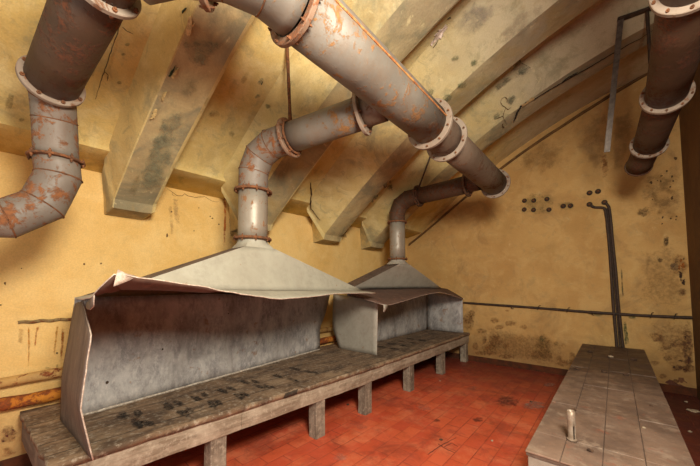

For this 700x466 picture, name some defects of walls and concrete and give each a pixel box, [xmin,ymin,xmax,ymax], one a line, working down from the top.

crack [95,25,132,99]
crack [497,30,653,127]
leakage [144,114,180,186]